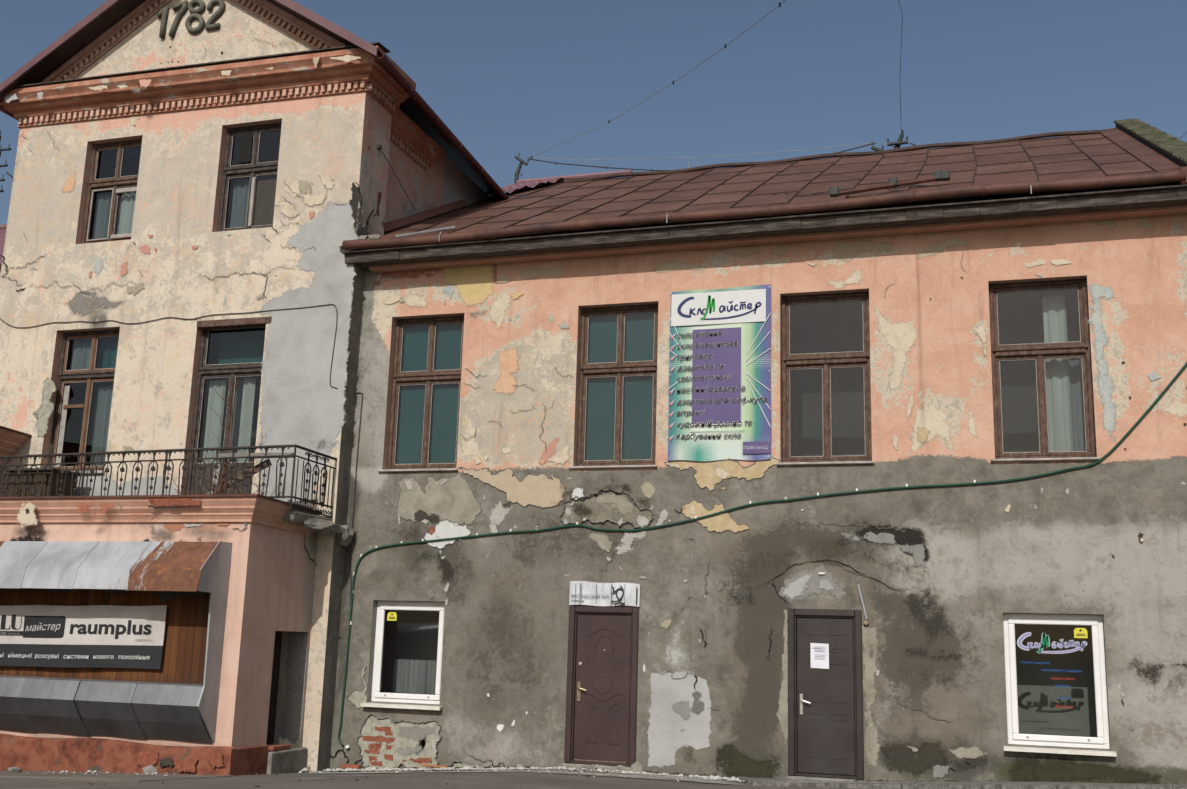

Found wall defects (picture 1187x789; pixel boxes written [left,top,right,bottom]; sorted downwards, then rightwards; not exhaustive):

peeling [279,172,335,219]
peeling [470,264,564,328]
peeling [873,306,917,389]
peeling [1087,283,1131,450]
flaking render [33,378,56,438]
peeling [893,395,955,458]
flaking render [397,445,571,559]
flaking render [589,456,780,579]
water stain [907,593,947,637]
flaking render [341,666,530,771]
peeling [672,701,691,720]
water stain [882,741,988,779]